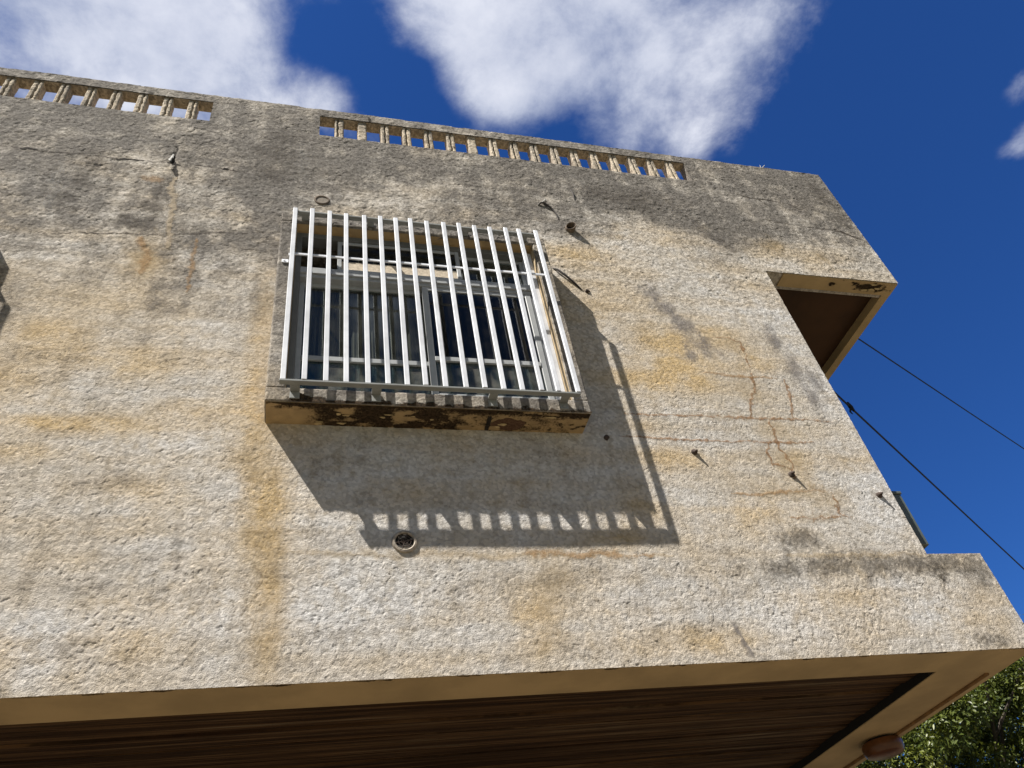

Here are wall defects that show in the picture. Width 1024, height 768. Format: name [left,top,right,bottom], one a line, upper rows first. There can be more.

peeling [852,282,886,292]
crack [625,337,830,479]
spalling [484,416,529,431]